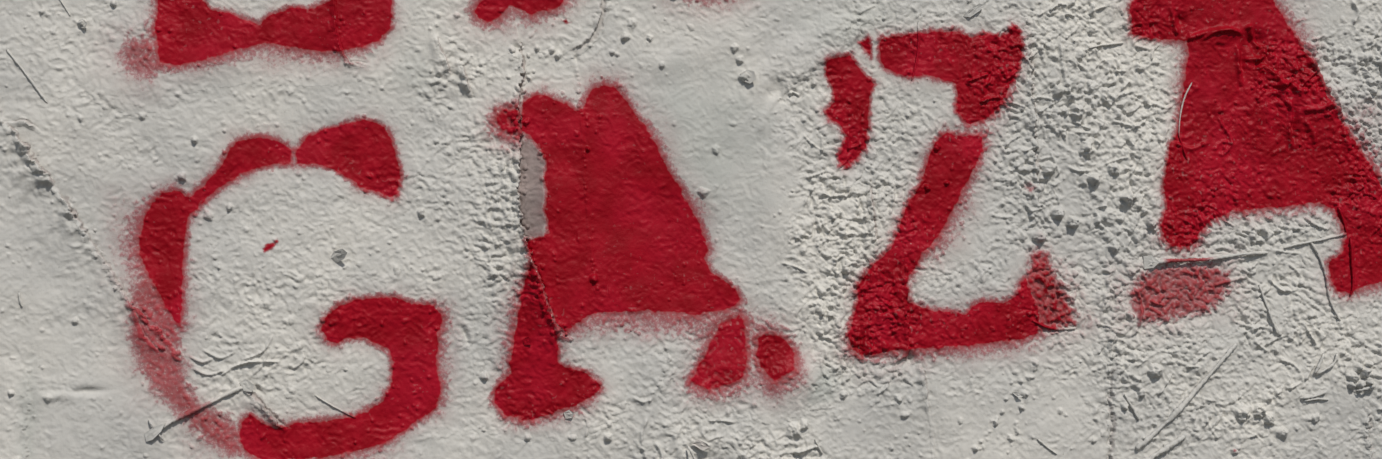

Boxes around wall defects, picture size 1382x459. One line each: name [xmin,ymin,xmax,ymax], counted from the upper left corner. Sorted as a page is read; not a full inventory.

crack [0,92,189,366]
crack [330,0,370,69]
crack [432,32,474,97]
crack [510,0,610,342]